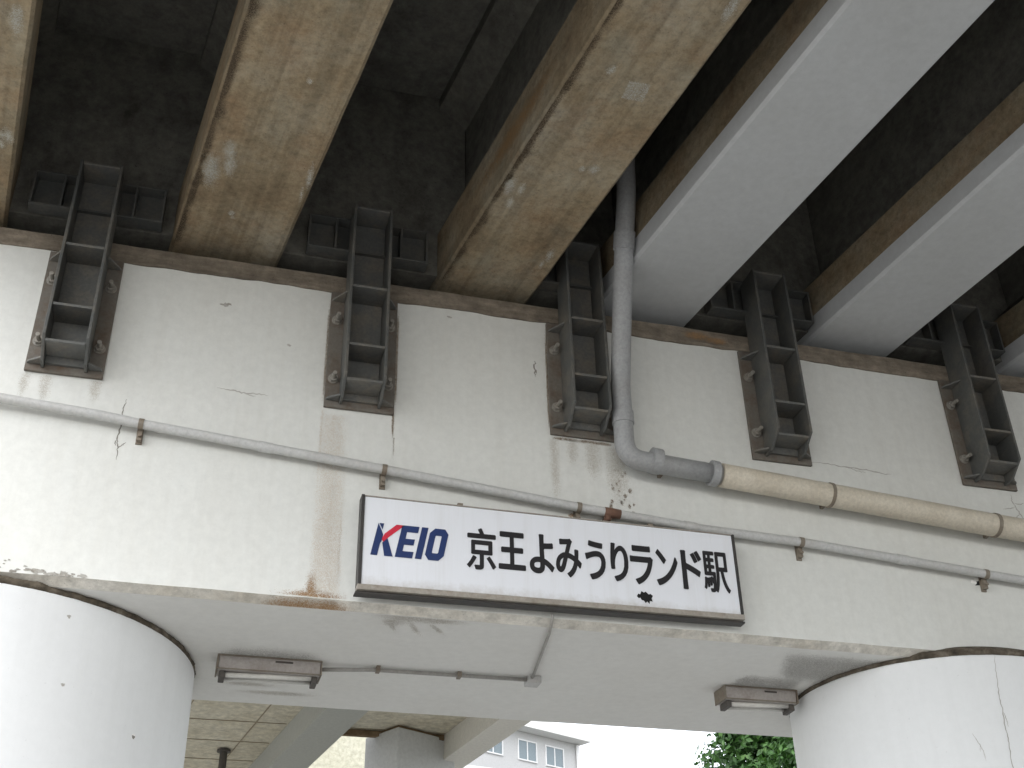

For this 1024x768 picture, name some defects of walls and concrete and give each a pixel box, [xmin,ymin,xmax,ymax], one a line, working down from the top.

crack [220,388,265,396]
crack [114,399,127,458]
corrosion [262,571,355,611]
crack [972,659,1014,768]